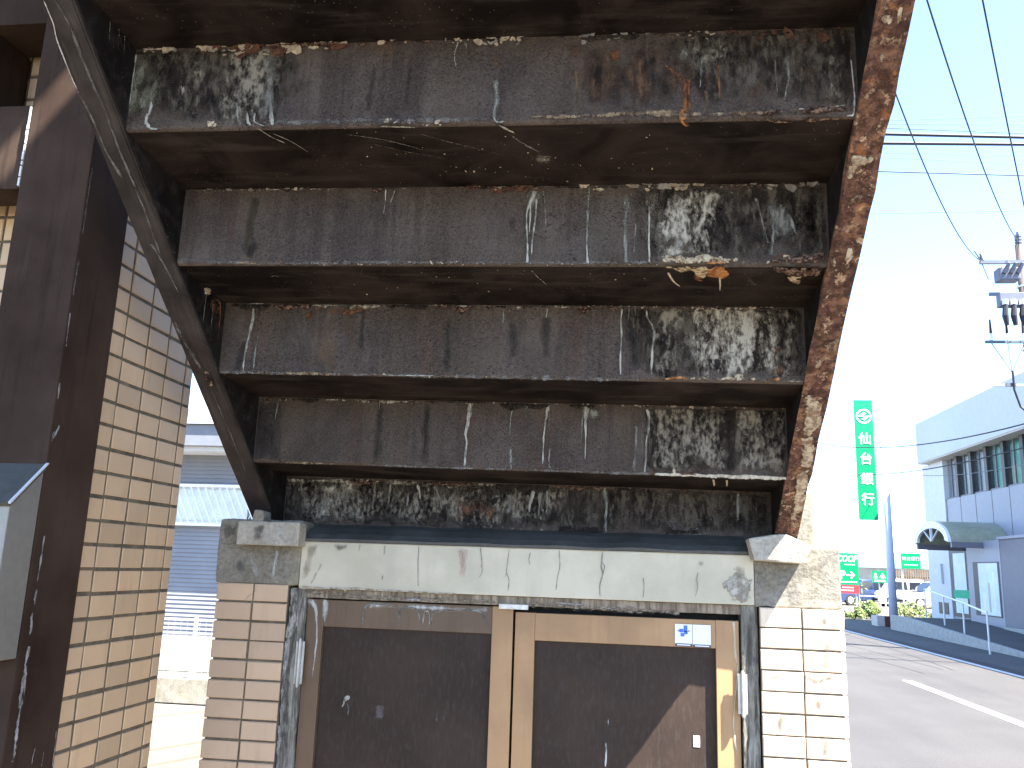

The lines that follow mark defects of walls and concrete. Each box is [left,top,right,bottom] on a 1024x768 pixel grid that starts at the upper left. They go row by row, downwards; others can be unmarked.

water stain [130,65,159,130]
peeling [129,41,348,118]
water stain [207,48,306,151]
corrosion [666,66,692,126]
corrosion [763,105,846,123]
water stain [526,187,546,263]
water stain [623,197,650,263]
water stain [755,198,796,253]
corrosion [767,253,827,284]
water stain [464,403,474,467]
crack [598,553,606,594]
peeling [722,573,752,602]